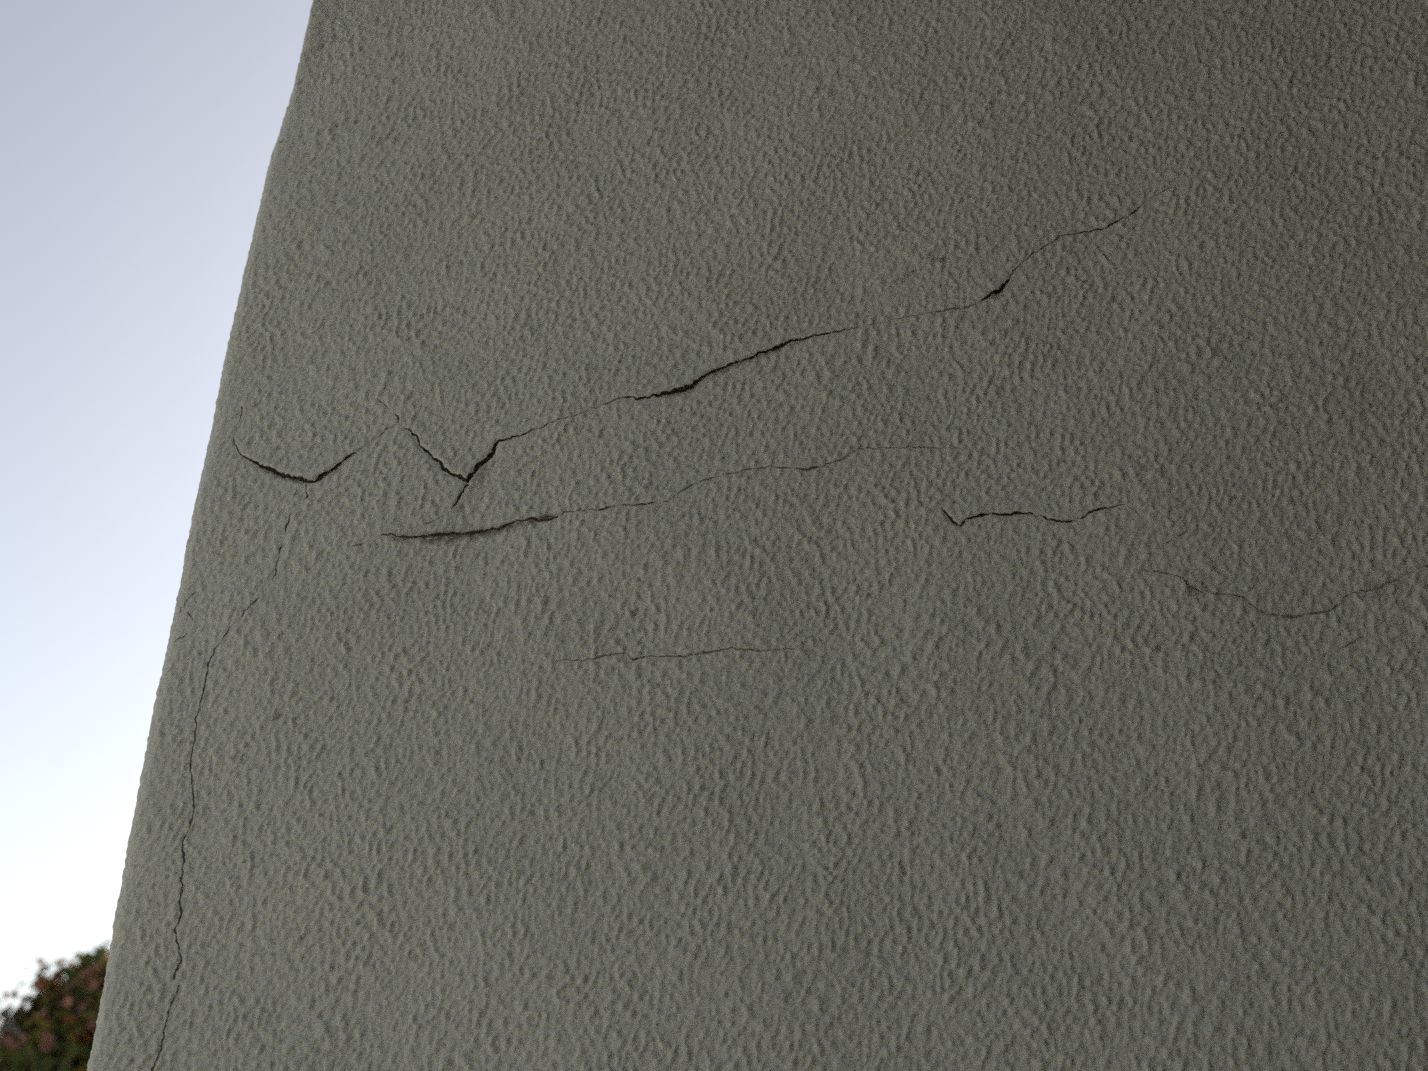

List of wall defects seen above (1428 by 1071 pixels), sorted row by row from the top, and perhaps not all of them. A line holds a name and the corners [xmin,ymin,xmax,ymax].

crack [151,188,1169,1071]
crack [1153,530,1428,618]